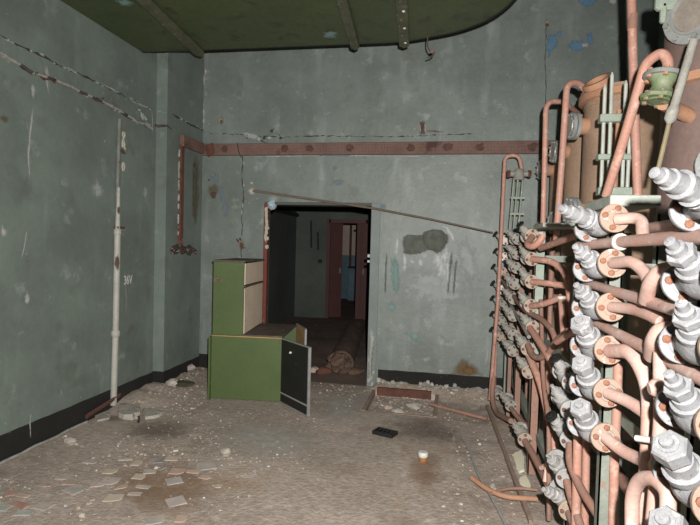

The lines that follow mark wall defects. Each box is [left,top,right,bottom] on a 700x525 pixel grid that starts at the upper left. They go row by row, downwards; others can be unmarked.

crack [1,35,471,258]